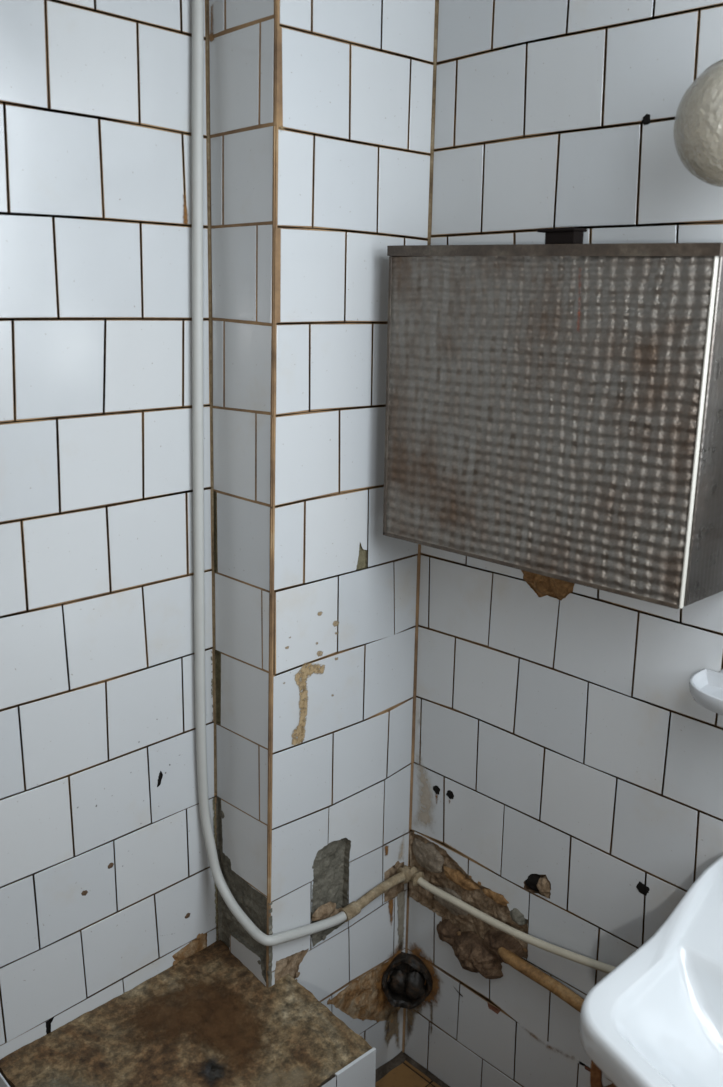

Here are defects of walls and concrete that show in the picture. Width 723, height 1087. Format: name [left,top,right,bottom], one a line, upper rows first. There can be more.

peeling [356,543,367,570]
peeling [213,795,351,987]
spalling [384,831,528,979]
hole [524,874,551,899]